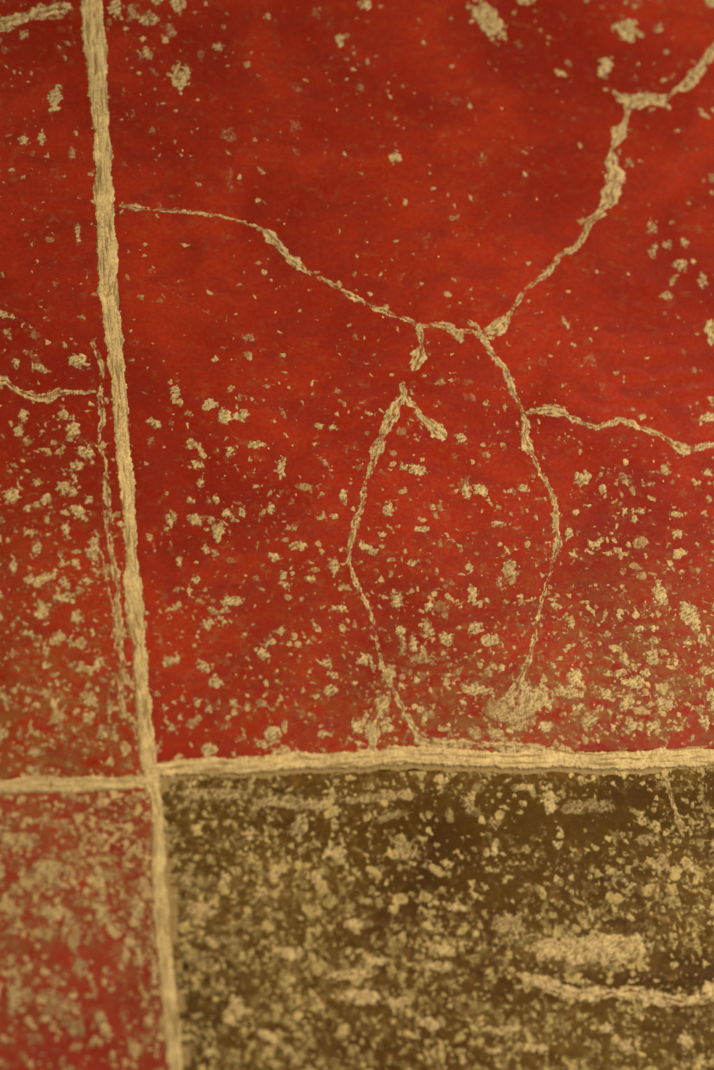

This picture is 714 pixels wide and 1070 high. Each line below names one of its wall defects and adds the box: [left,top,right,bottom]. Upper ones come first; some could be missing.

spalling [169,385,250,425]
crack [120,43,714,752]
spalling [575,469,628,495]
spalling [2,415,102,669]
crack [0,340,136,719]
spalling [166,494,245,556]
spalling [201,595,244,631]
spalling [395,600,453,683]
spalling [652,580,708,648]
spalling [462,649,685,747]
water stain [660,775,684,837]
water stain [516,972,714,1008]